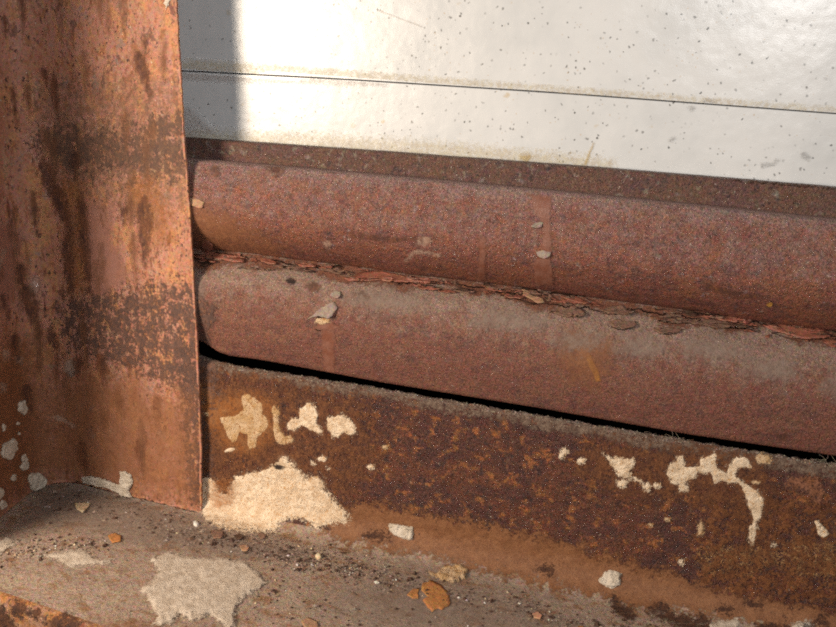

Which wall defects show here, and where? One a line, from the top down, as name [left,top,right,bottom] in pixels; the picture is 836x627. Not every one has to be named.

rust [134,51,151,97]
rust [0,108,385,510]
peeling [308,291,341,325]
peeling [343,270,452,285]
rust [193,213,836,348]
peeling [501,289,544,303]
peeling [763,324,831,339]
peeling [200,392,358,551]
peeling [74,502,91,513]
rust [322,433,836,627]
peeling [603,451,773,546]
rust [0,599,79,627]